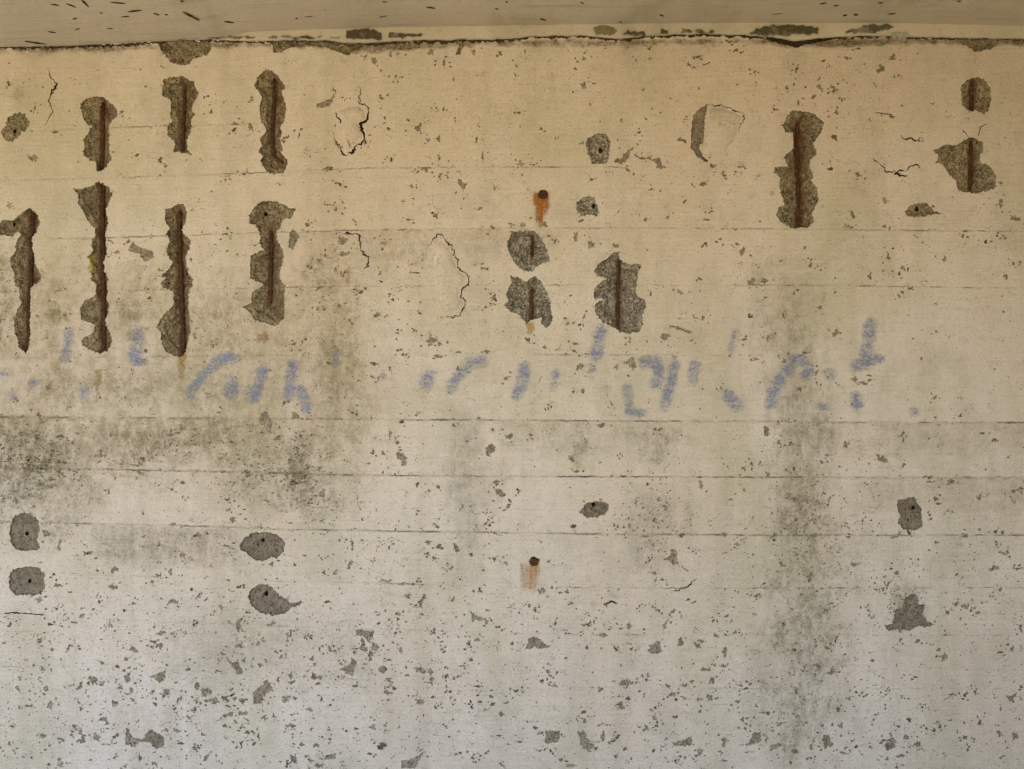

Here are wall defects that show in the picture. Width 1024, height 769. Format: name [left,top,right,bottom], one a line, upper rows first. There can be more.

spalling [128,40,225,179]
spalling [0,96,490,392]
spalling [217,66,349,188]
crack [331,86,370,156]
crack [427,234,470,319]
corrosion [533,190,549,224]
peeling [677,104,746,195]
spalling [762,38,902,229]
spalling [918,132,1024,280]
spalling [960,77,992,122]
spalling [464,196,711,484]
corrosion [522,556,540,588]